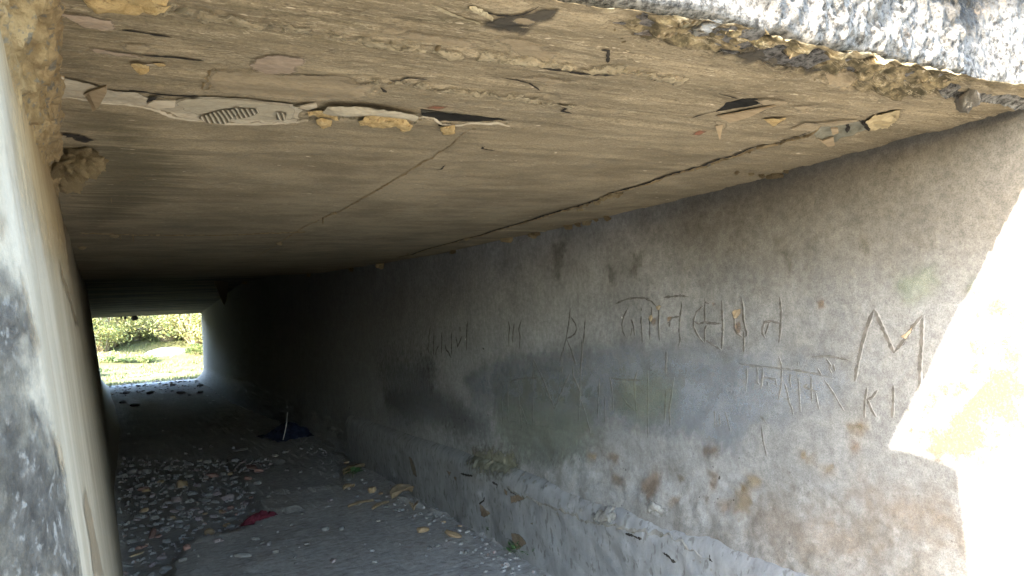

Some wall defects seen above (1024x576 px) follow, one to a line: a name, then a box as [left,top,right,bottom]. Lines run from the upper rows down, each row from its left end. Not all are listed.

spalling [0,0,514,206]
spalling [329,28,690,86]
spalling [764,105,900,147]
peeling [806,63,883,95]
crack [397,126,821,258]